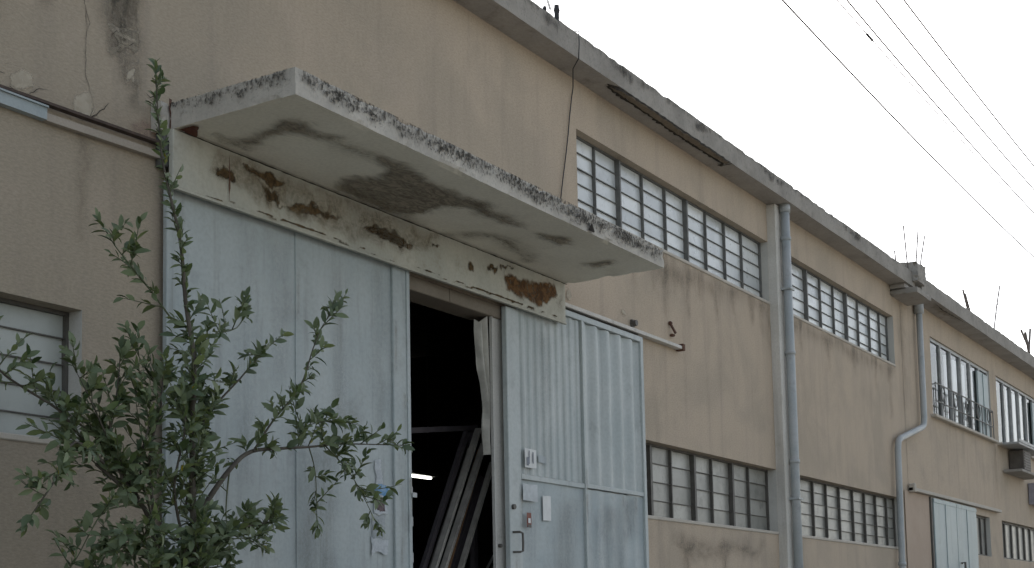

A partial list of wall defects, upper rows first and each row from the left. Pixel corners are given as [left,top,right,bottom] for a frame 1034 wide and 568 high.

leakage [234,121,331,145]
corrosion [208,157,375,255]
leakage [341,157,519,240]
corrosion [365,224,413,250]
corrosion [445,264,557,317]